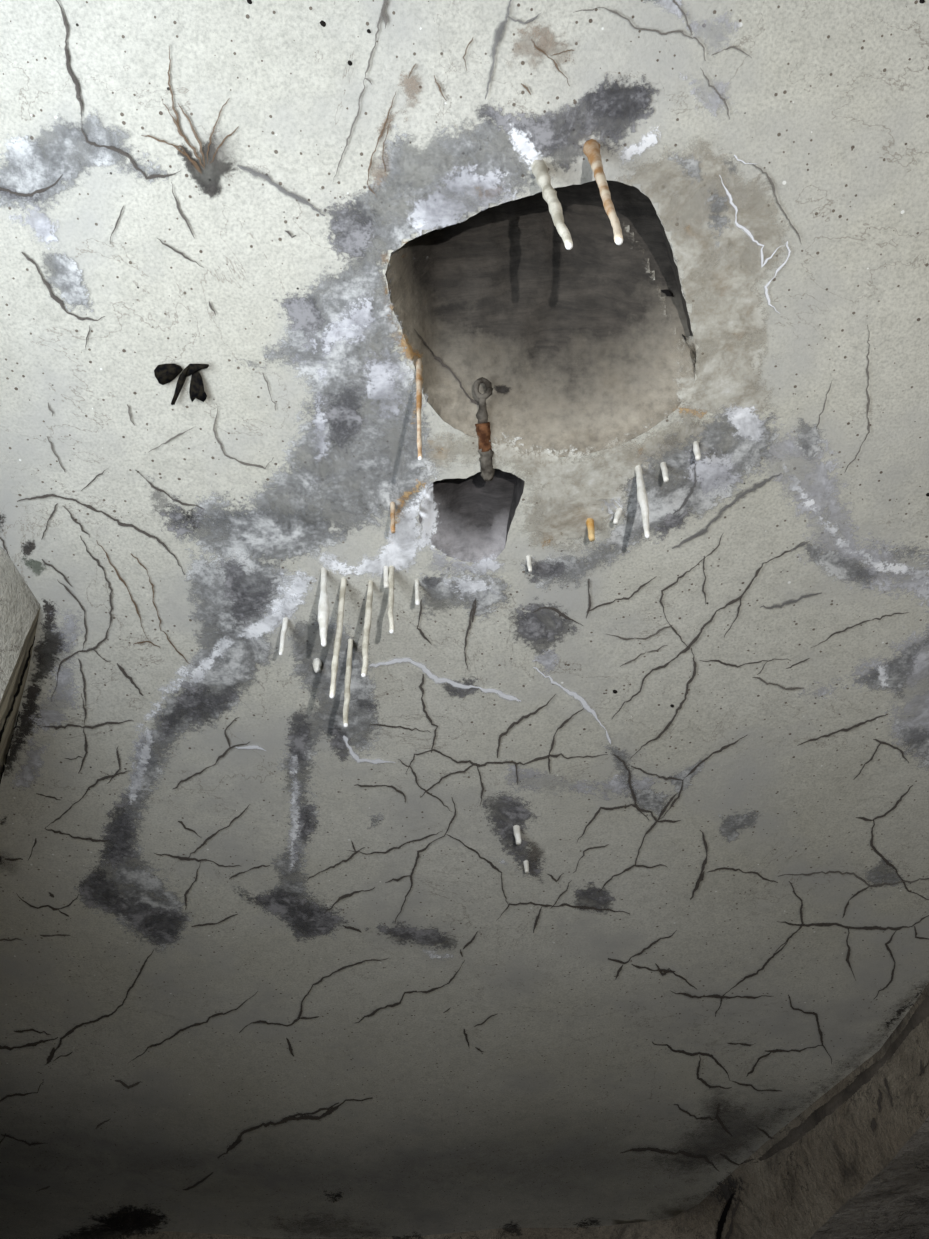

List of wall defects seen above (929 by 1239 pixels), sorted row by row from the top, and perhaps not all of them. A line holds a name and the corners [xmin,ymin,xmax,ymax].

crack [56,0,204,268]
crack [237,164,325,216]
crack [334,0,388,177]
crack [463,0,574,99]
crack [22,252,105,348]
spalling [385,180,696,457]
crack [136,408,274,509]
spalling [419,469,525,563]
water stain [75,73,929,953]
crack [0,403,191,861]
crack [115,464,929,1170]
water stain [366,921,455,959]